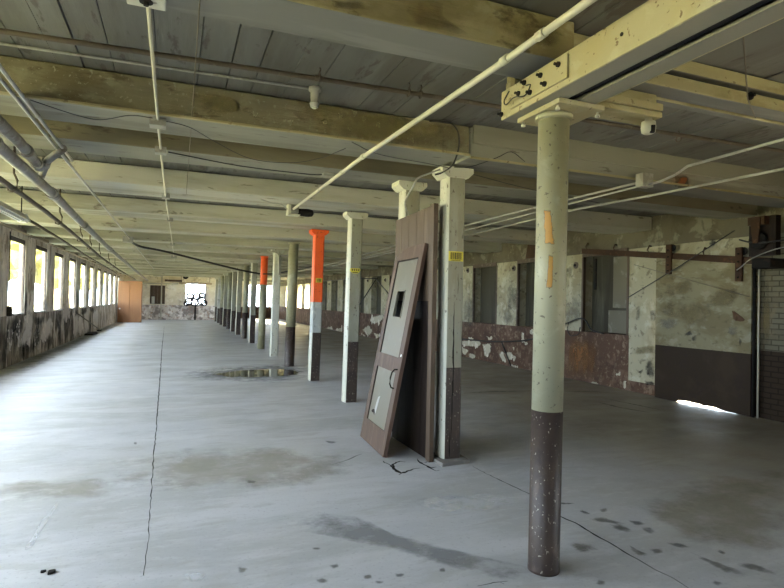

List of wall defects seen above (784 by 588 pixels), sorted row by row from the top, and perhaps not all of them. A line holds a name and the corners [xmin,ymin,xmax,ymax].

water stain [0,290,93,362]
peeling [361,315,384,338]
peeling [462,329,533,368]
crack [383,316,454,475]
crack [143,332,164,575]
water stain [329,524,474,565]